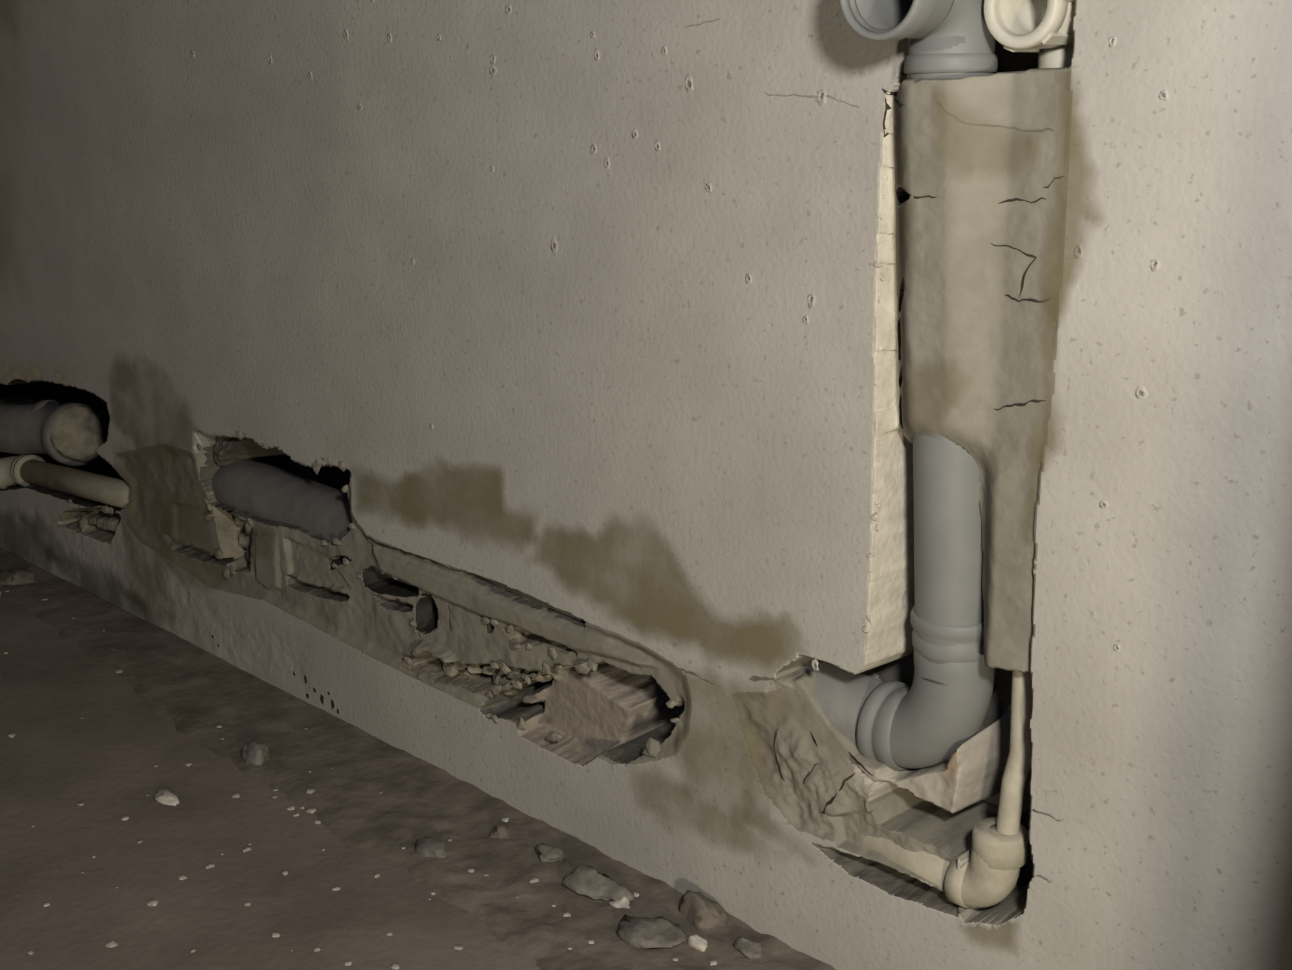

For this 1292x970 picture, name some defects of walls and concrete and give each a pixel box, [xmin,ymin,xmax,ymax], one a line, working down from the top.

crack [998,176,1064,204]
crack [991,243,1050,303]
spalling [0,377,124,480]
crack [995,400,1045,410]
spalling [0,485,130,544]
water stain [361,472,531,540]
spalling [197,431,684,766]
water stain [623,566,785,664]